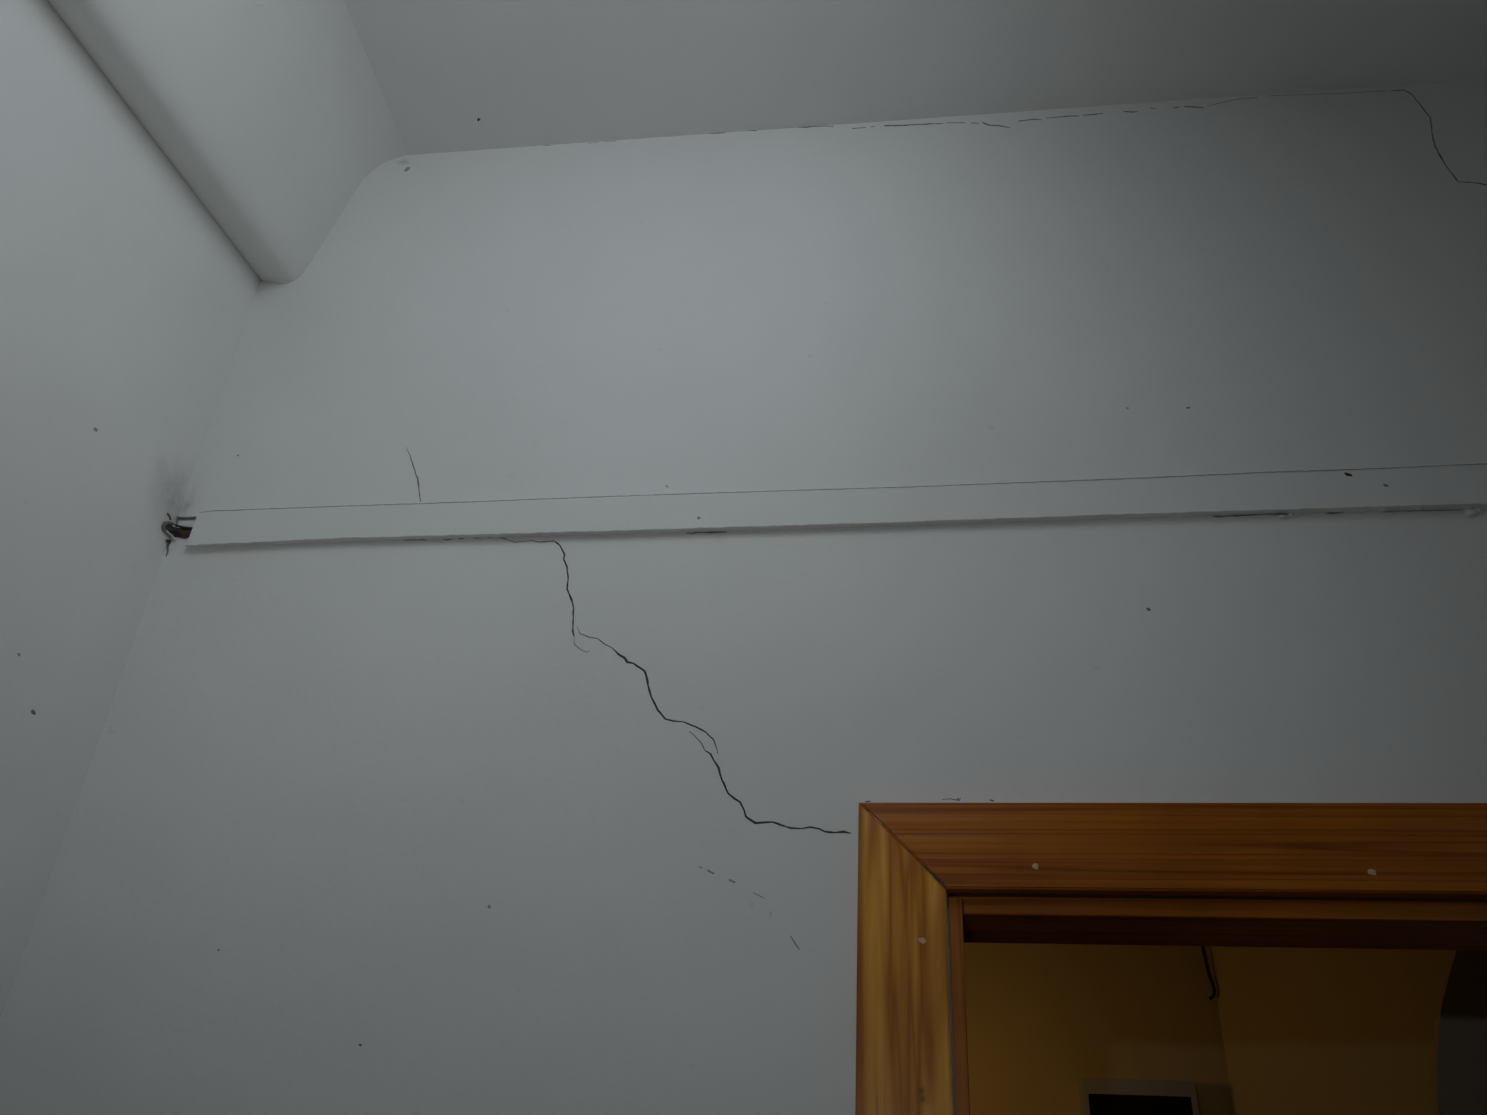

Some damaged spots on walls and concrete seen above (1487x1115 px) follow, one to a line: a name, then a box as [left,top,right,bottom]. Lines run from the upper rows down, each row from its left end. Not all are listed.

crack [798,90,1487,186]
crack [199,447,1487,513]
crack [419,537,851,834]